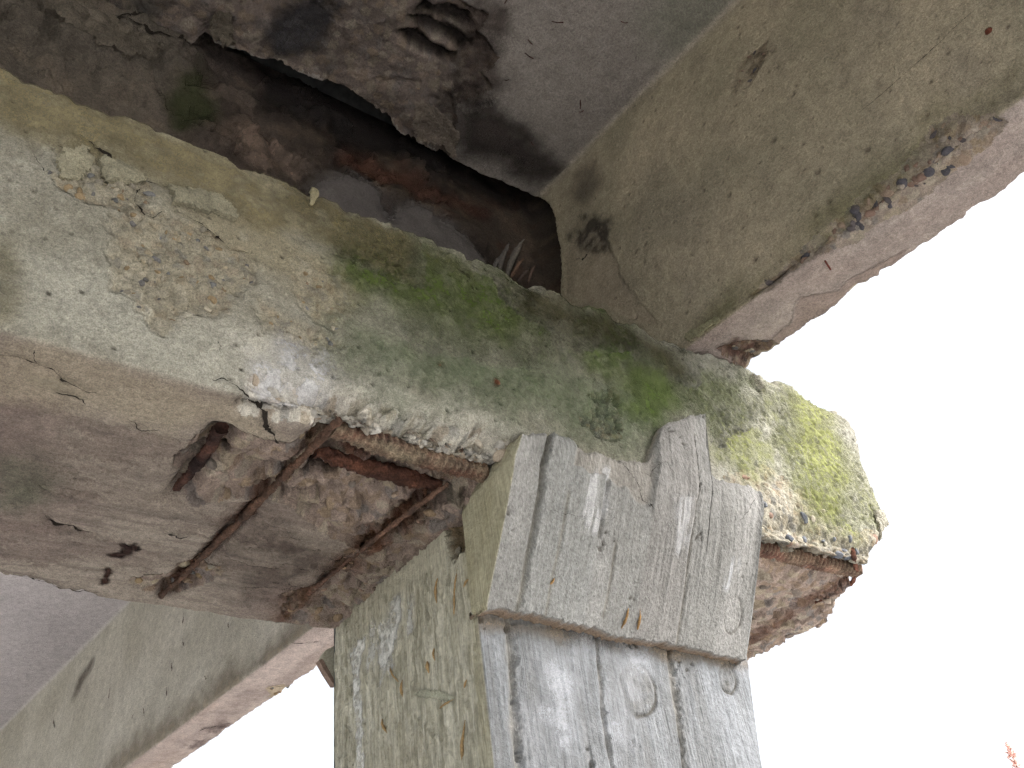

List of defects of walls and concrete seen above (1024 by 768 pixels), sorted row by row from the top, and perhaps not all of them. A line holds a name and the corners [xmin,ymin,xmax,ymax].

spalling [98,0,500,158]
water stain [255,3,562,207]
spalling [47,143,357,355]
water stain [569,215,609,253]
crack [3,350,96,405]
rust [100,543,141,585]
rust [170,477,269,583]
crack [213,378,279,444]
spalling [128,371,510,629]
rust [340,440,370,458]
rust [321,488,428,573]
spalling [723,462,889,661]